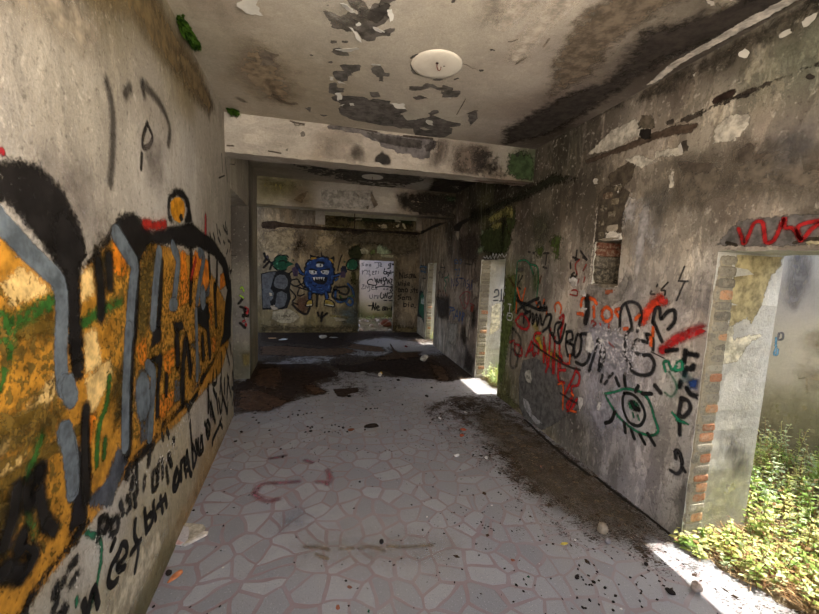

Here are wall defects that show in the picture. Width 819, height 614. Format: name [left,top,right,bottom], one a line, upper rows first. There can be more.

peeling [237,0,263,16]
peeling [321,0,478,159]
leakage [502,0,819,145]
peeling [589,115,655,154]
leakage [585,62,819,164]
peeling [713,114,750,144]
peeling [292,164,429,188]
leakage [486,172,576,212]
spalling [569,140,689,307]
leakage [624,142,819,289]
peeling [585,322,651,375]